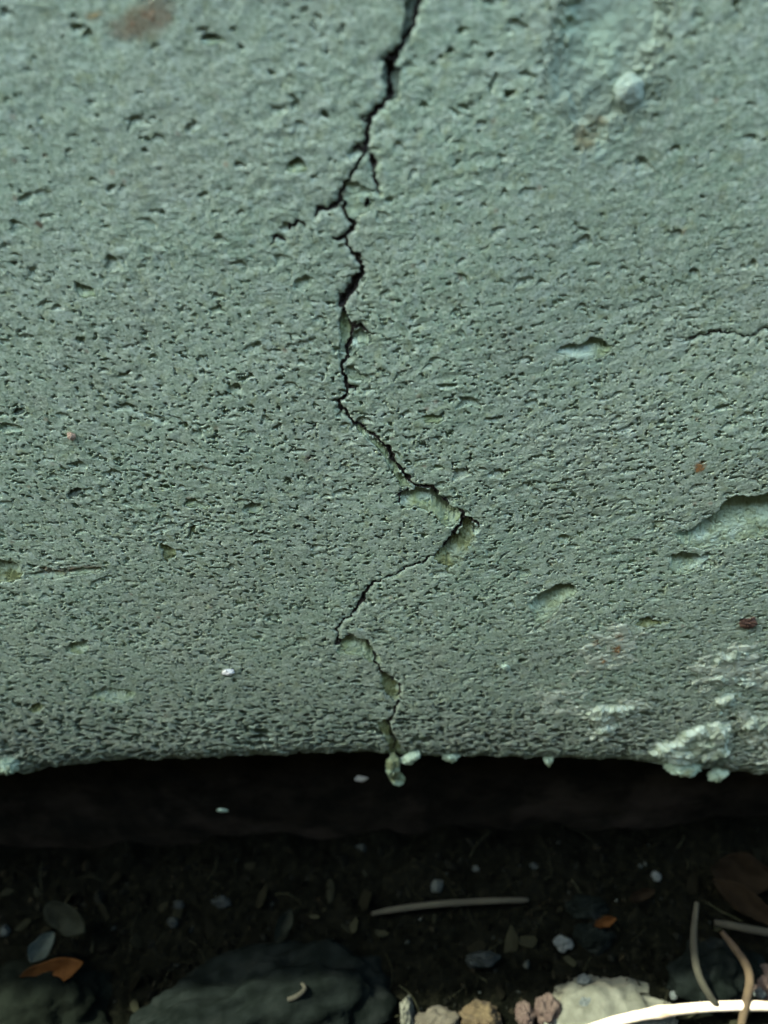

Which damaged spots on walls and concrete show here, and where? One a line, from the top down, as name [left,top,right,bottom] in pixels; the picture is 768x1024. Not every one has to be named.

crack [270,0,480,751]
spalling [398,486,480,571]
spalling [668,493,768,575]